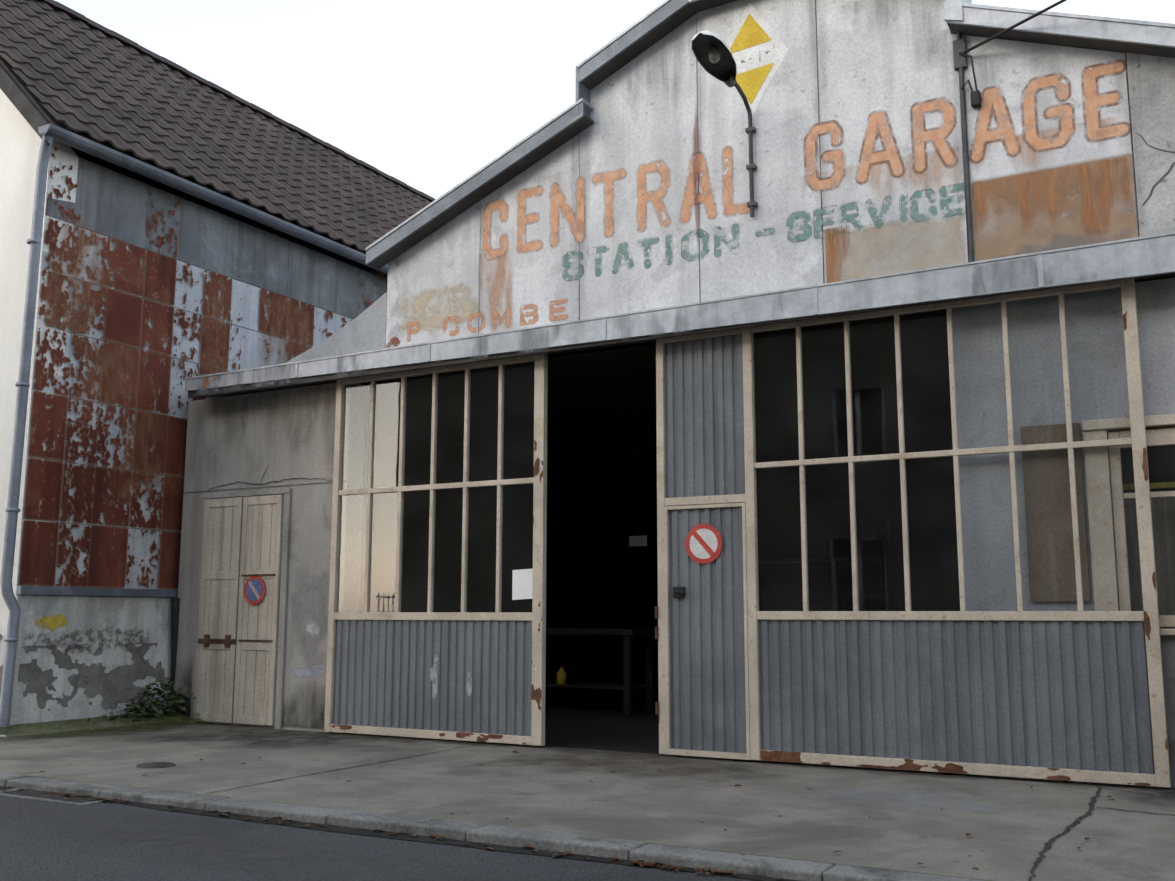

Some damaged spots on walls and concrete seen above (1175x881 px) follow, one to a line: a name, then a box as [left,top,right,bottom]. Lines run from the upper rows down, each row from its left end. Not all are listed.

crack [1136,133,1175,206]
corrosion [972,155,1137,261]
peeling [18,643,171,711]